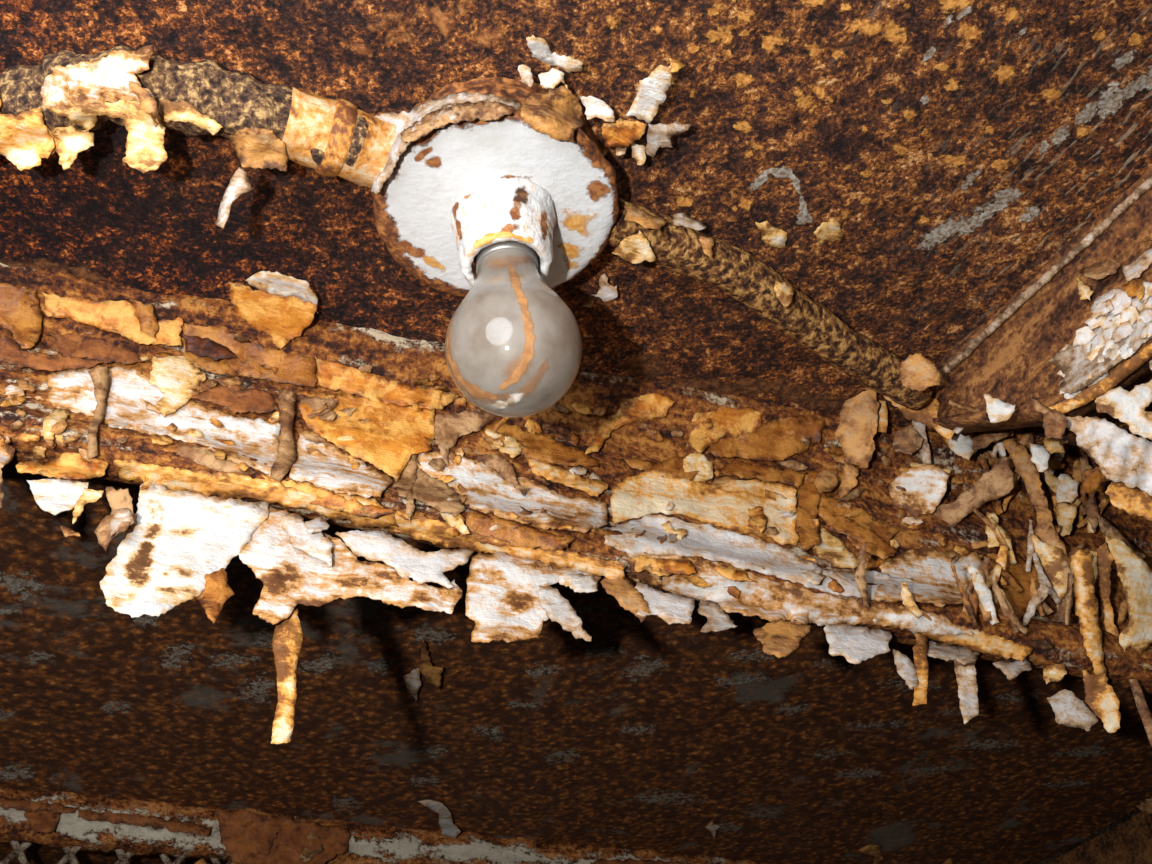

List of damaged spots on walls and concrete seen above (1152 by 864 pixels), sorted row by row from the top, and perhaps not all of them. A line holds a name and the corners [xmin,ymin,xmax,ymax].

corrosion [688,3,789,58]
corrosion [841,3,907,46]
corrosion [938,0,974,14]
peeling [0,45,288,174]
peeling [371,35,691,195]
corrosion [414,147,441,168]
corrosion [733,121,764,157]
corrosion [398,240,445,270]
peeling [612,208,715,264]
peeling [755,220,788,248]
peeling [813,217,844,245]
peeling [0,797,350,864]